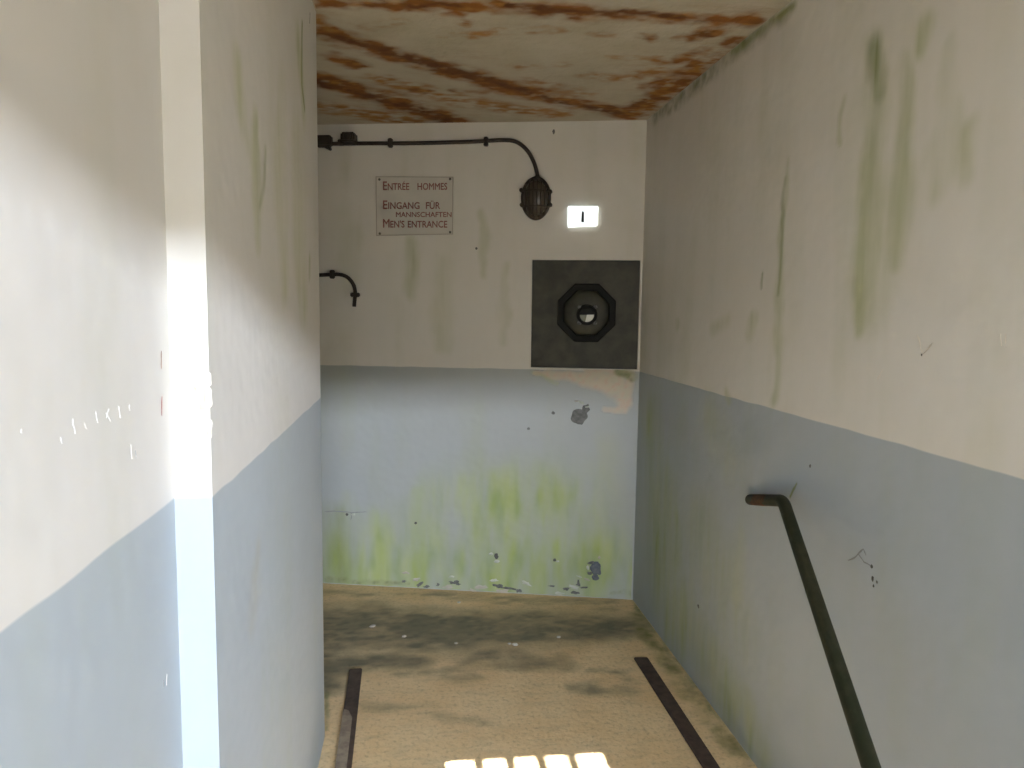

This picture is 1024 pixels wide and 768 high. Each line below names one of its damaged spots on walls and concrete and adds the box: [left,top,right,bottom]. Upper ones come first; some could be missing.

corrosion [313,0,772,124]
damp [759,172,788,301]
damp [842,0,986,350]
peeling [528,368,638,425]
damp [448,426,635,566]
peeling [402,571,532,593]
damp [322,481,648,732]
spalling [550,556,601,596]